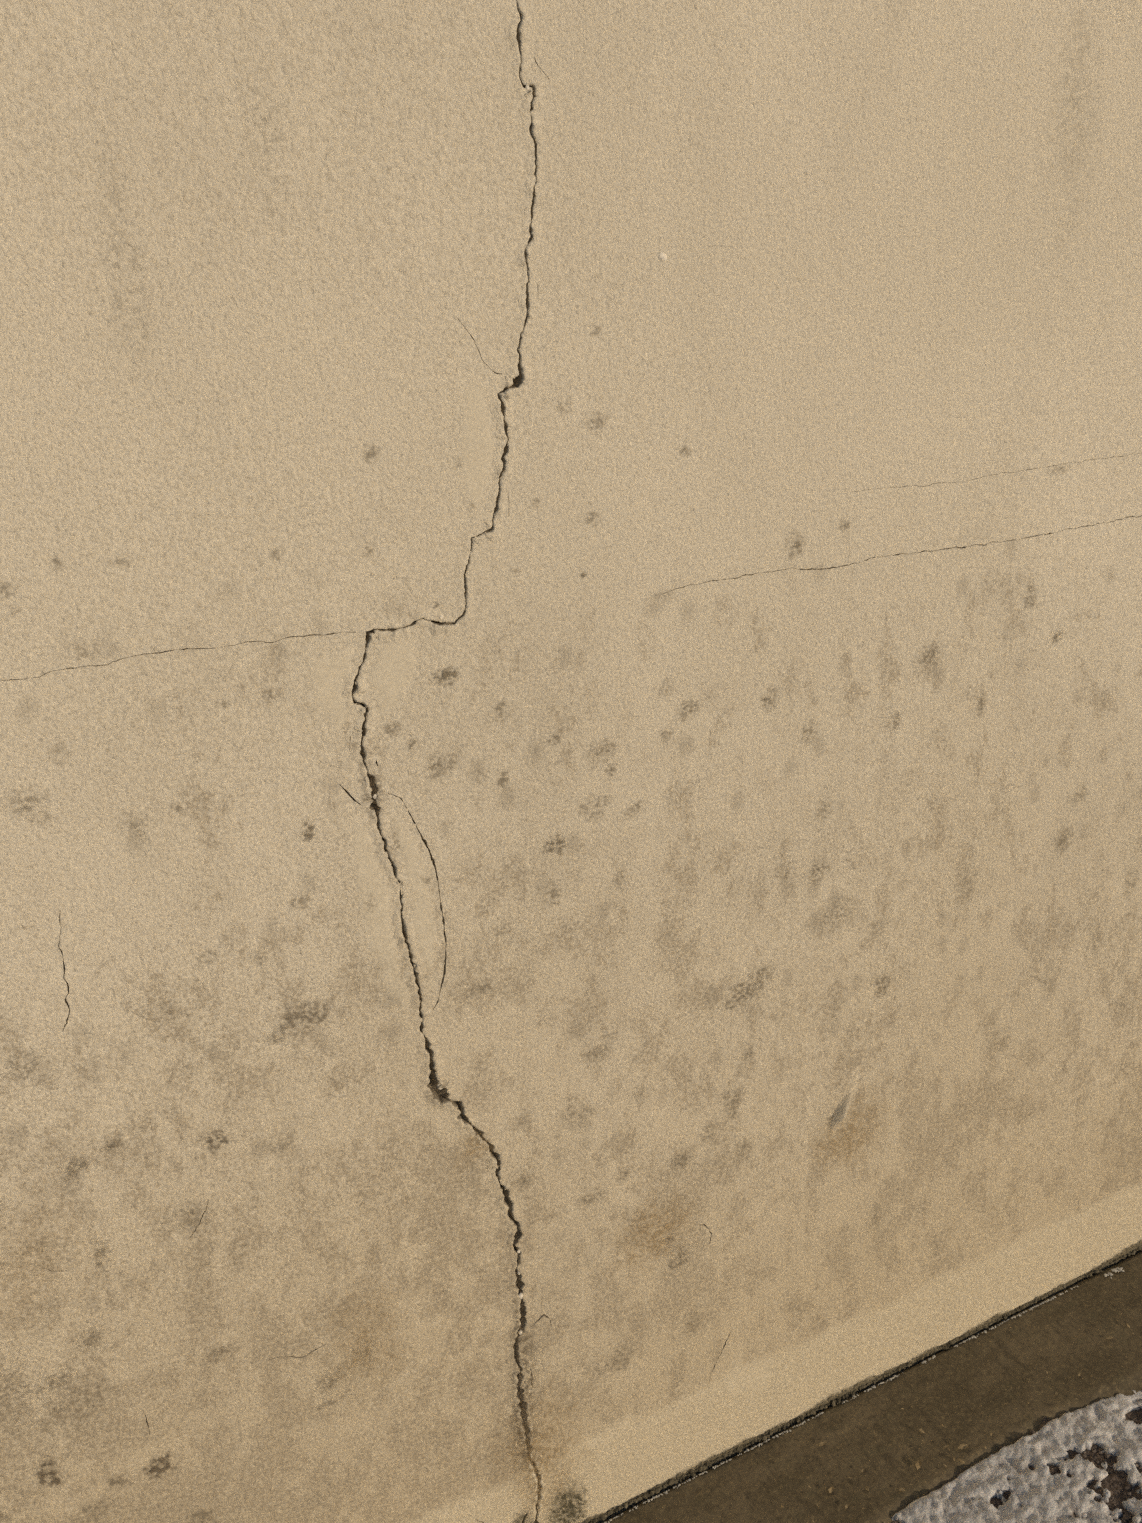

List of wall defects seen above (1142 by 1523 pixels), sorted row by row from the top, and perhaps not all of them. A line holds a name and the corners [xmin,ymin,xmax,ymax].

crack [663,515,1142,594]
crack [1,0,551,1523]
damp [585,1241,1142,1523]
damp [38,1463,61,1485]
damp [145,1455,171,1477]